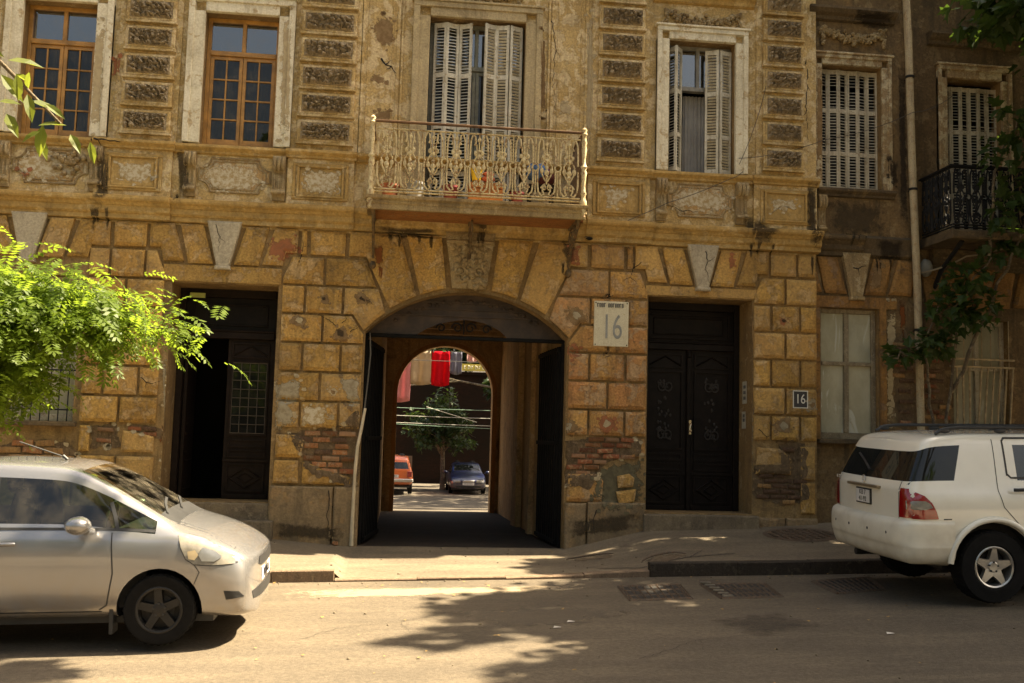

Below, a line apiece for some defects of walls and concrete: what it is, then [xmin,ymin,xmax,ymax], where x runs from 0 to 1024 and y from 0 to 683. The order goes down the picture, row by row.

flaking render [0,422,163,480]
flaking render [274,373,361,488]
flaking render [564,415,645,513]
flaking render [752,415,810,506]